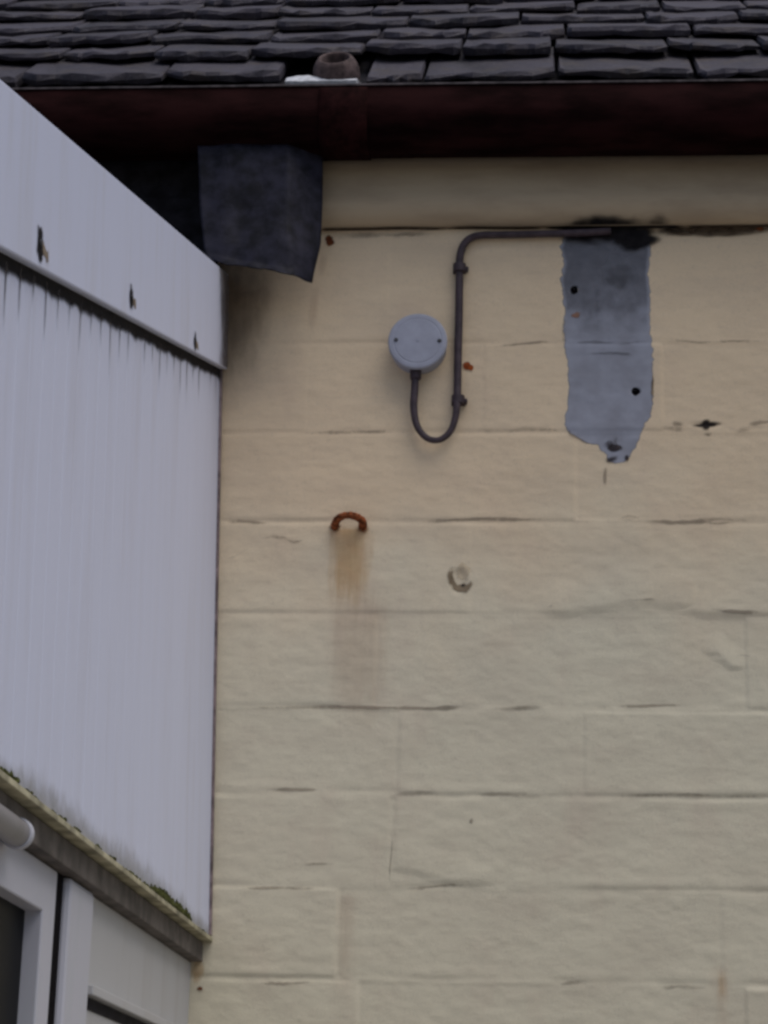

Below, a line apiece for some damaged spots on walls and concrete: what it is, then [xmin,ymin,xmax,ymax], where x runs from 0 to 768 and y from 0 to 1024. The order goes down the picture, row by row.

water stain [547,217,680,250]
peeling [560,237,654,463]
spalling [448,564,472,592]